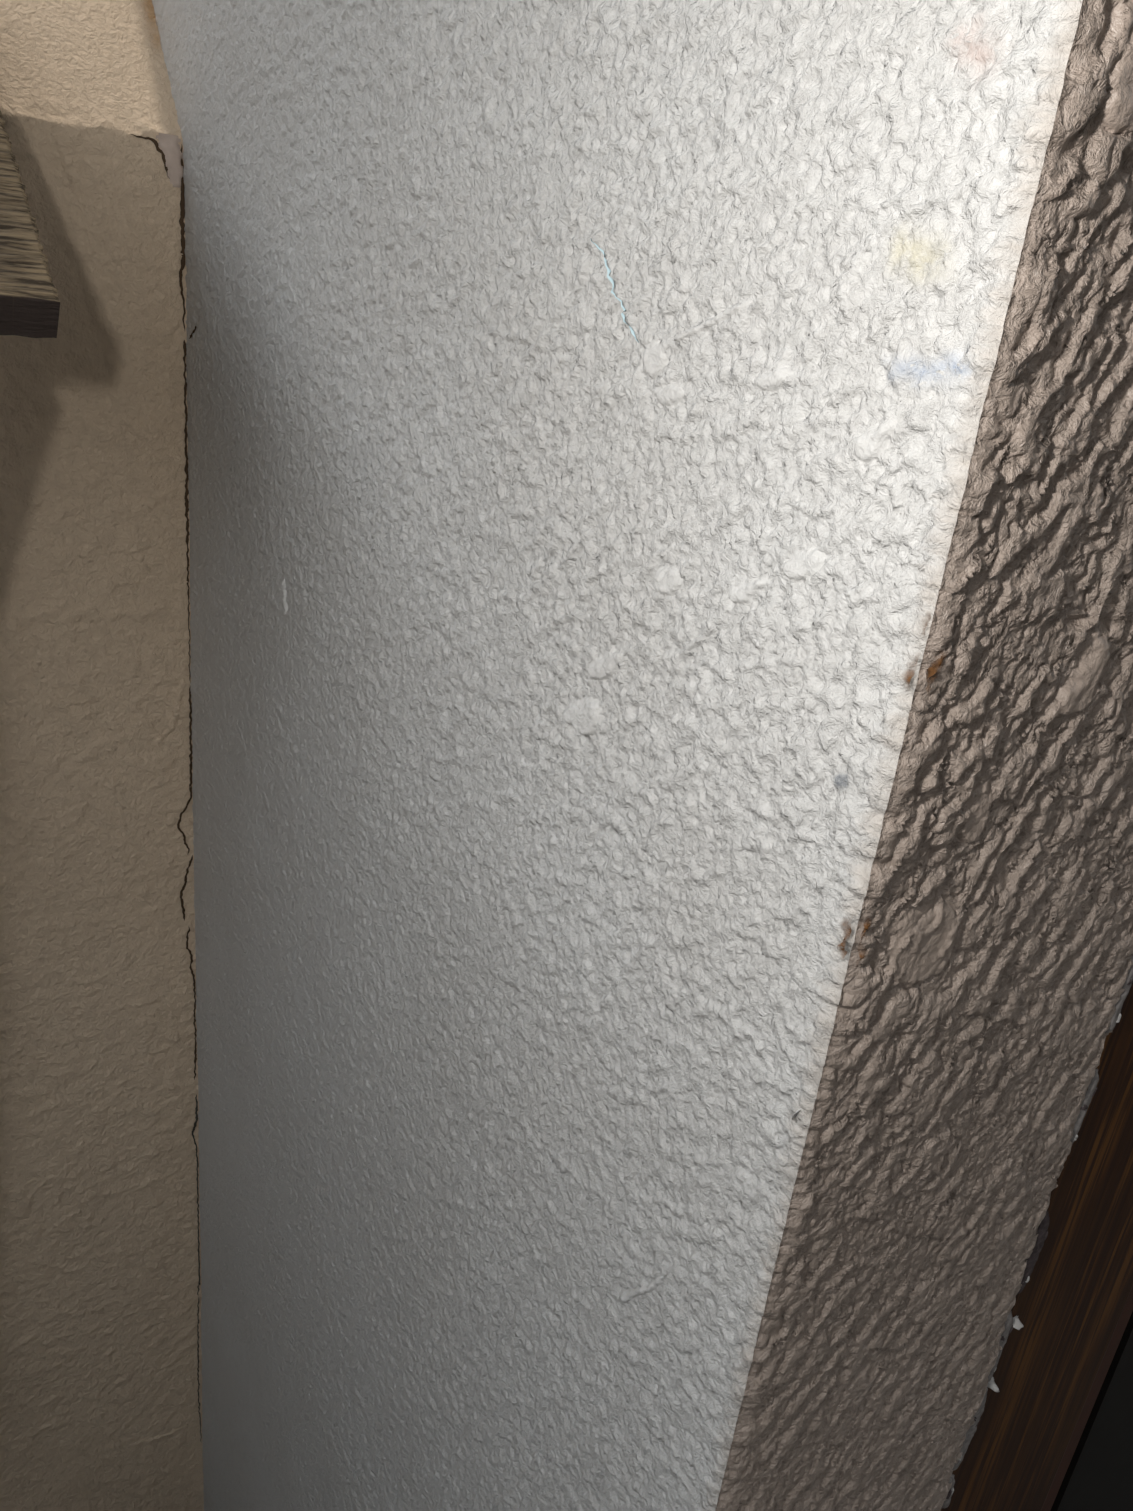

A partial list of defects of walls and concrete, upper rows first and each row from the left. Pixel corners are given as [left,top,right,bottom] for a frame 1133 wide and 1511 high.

crack [131,134,202,1443]
peeling [1070,1069,1099,1144]
peeling [1017,1211,1049,1294]
peeling [941,1311,1024,1509]